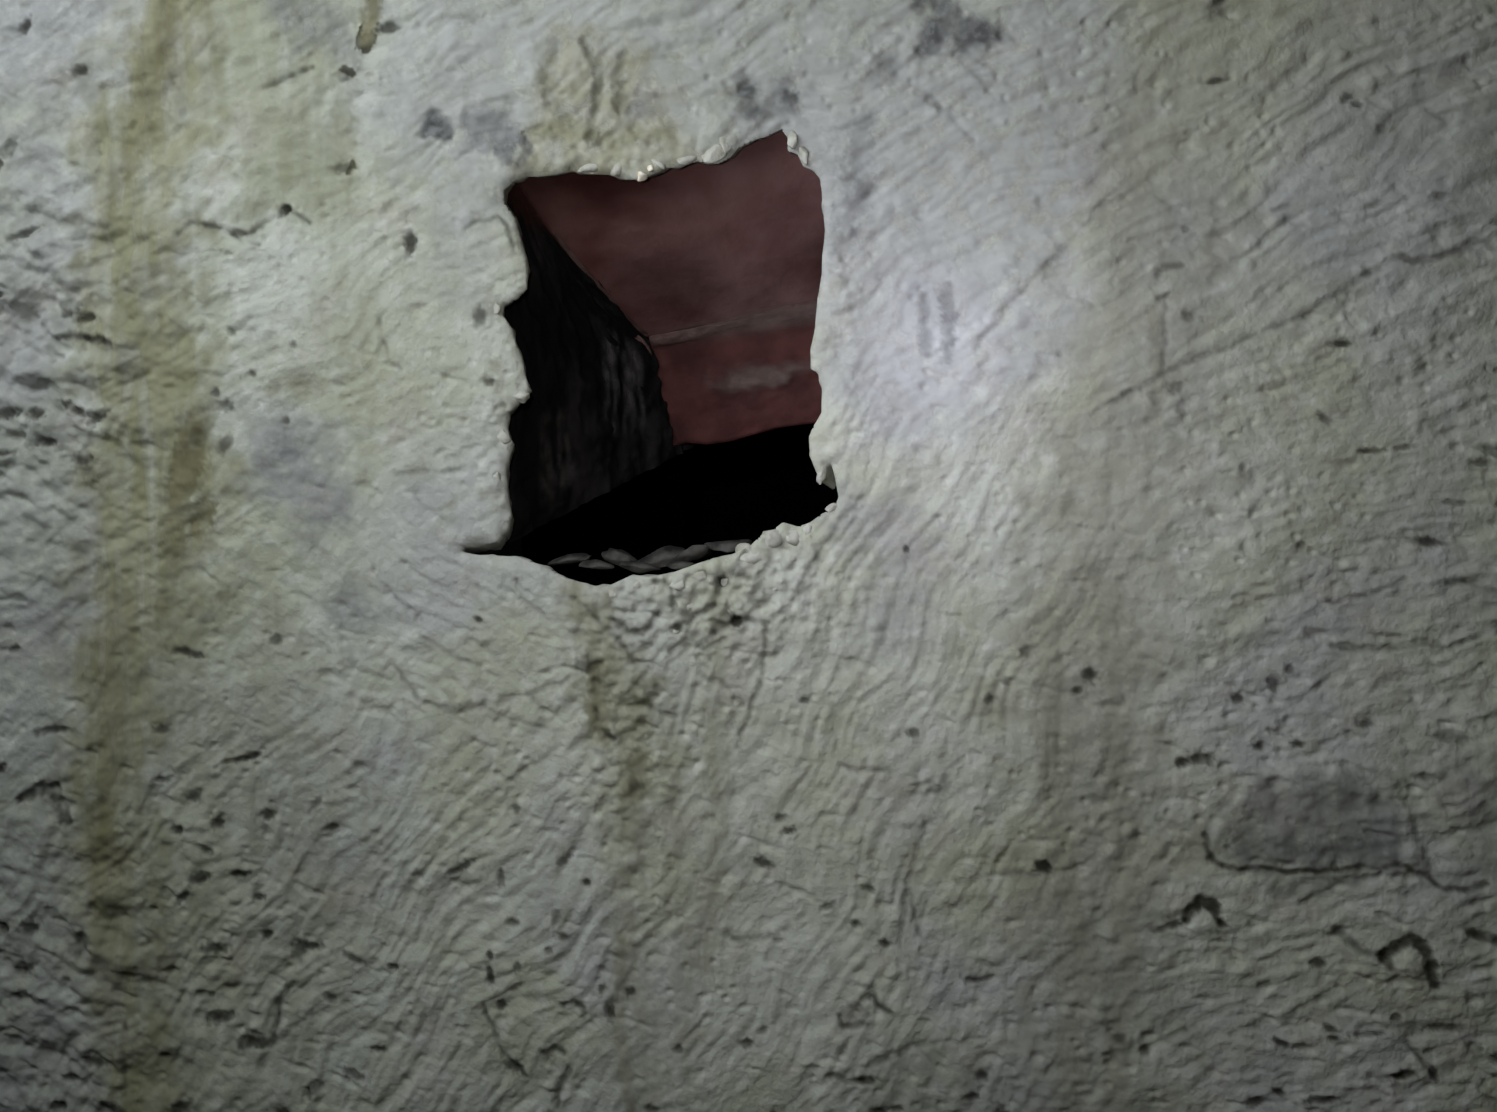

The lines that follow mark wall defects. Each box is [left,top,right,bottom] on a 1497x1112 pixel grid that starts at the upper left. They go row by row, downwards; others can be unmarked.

flaking render [565,136,731,182]
flaking render [787,130,809,165]
spalling [474,186,838,614]
crack [731,618,741,627]